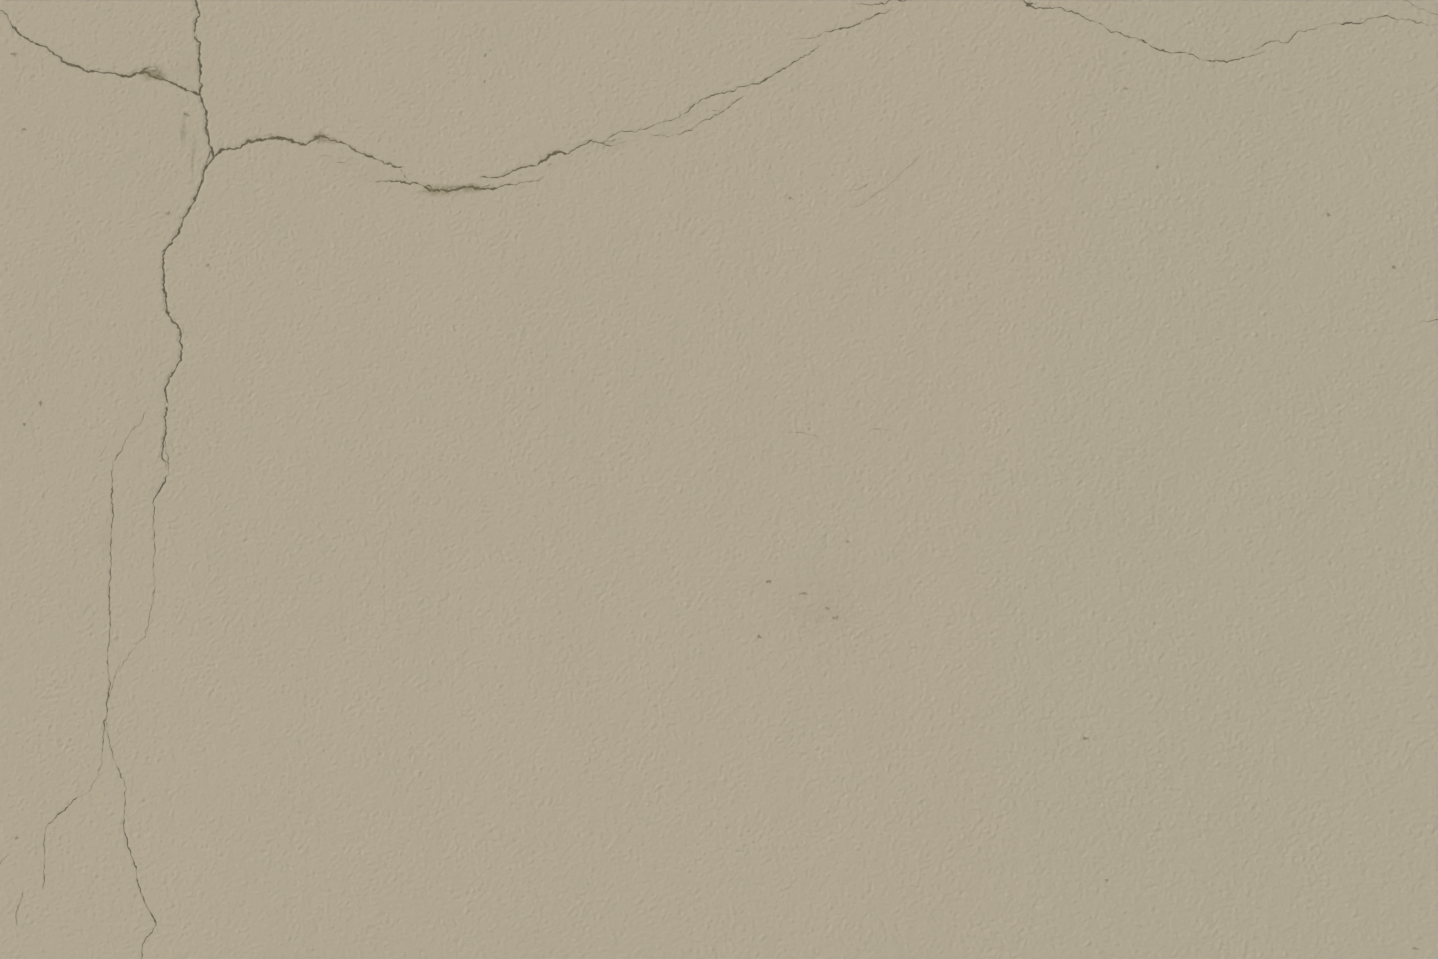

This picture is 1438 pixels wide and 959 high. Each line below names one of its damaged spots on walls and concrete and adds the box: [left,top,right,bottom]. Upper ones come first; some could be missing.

crack [0,0,906,959]
crack [1020,0,1438,63]